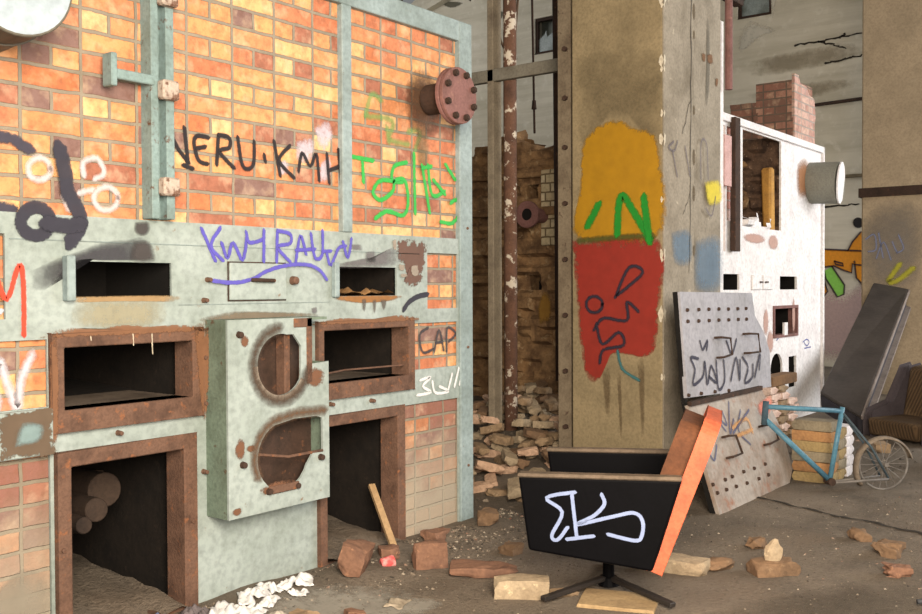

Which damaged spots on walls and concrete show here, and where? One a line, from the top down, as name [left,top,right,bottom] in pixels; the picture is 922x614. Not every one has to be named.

crack [794,32,862,64]
corrosion [0,295,419,461]